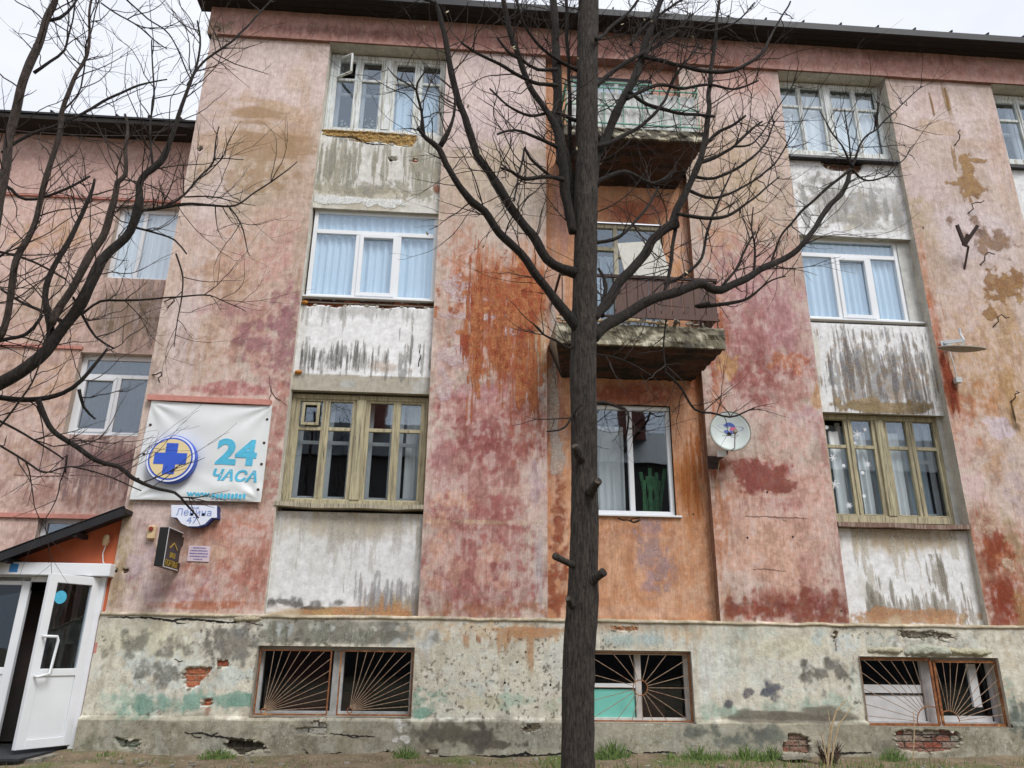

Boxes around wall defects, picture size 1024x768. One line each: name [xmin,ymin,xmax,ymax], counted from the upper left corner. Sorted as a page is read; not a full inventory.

water stain [228,133,440,199]
spalling [322,129,418,162]
peeling [945,146,988,202]
peeling [982,266,1024,321]
water stain [300,332,431,382]
rust [434,236,546,423]
water stain [820,326,940,414]
water stain [851,529,976,625]
peeling [181,658,252,710]
crack [184,732,245,740]
flaking render [782,734,813,755]
flaking render [893,730,964,754]